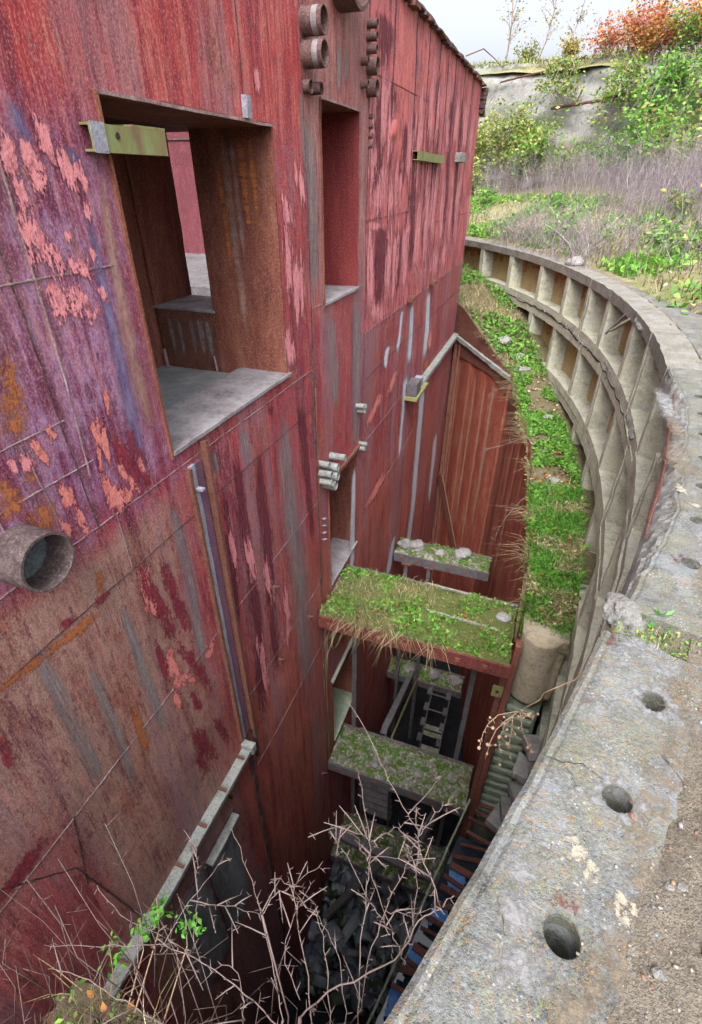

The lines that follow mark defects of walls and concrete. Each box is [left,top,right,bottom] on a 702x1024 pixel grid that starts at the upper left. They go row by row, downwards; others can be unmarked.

peeling [0,105,110,331]
corrosion [0,339,31,440]
peeling [7,423,57,477]
corrosion [0,472,64,530]
peeling [88,389,155,517]
spalling [602,370,701,638]
corrosion [0,569,108,691]
peeling [135,557,232,780]